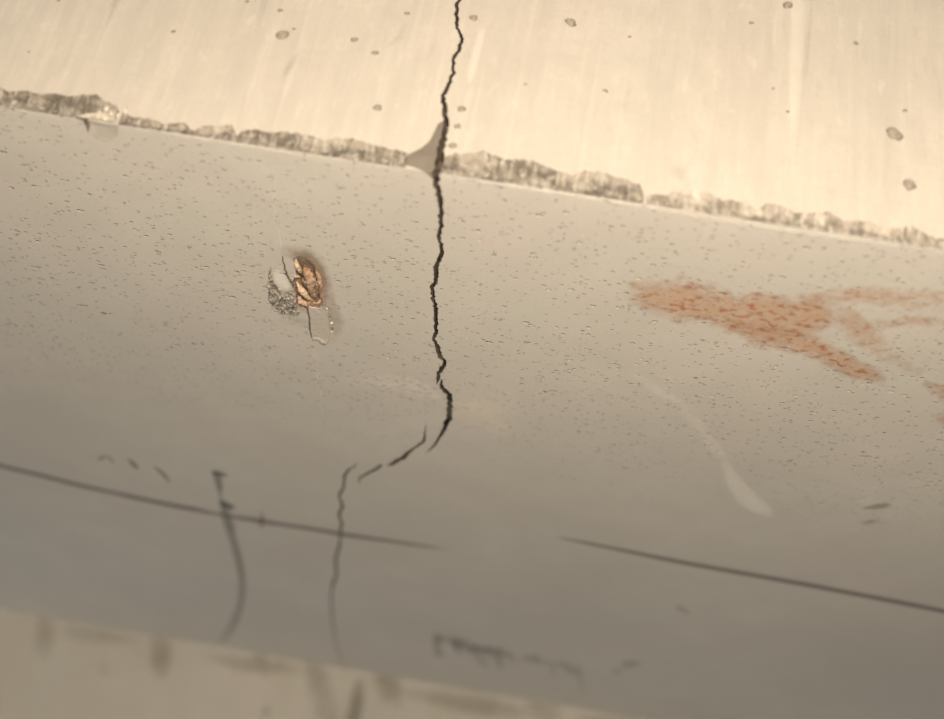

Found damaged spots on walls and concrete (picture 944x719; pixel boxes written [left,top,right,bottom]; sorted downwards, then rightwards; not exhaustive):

spalling [0,87,408,168]
spalling [441,150,944,249]
spalling [267,256,333,345]
crack [330,0,464,719]
rust [641,284,878,380]